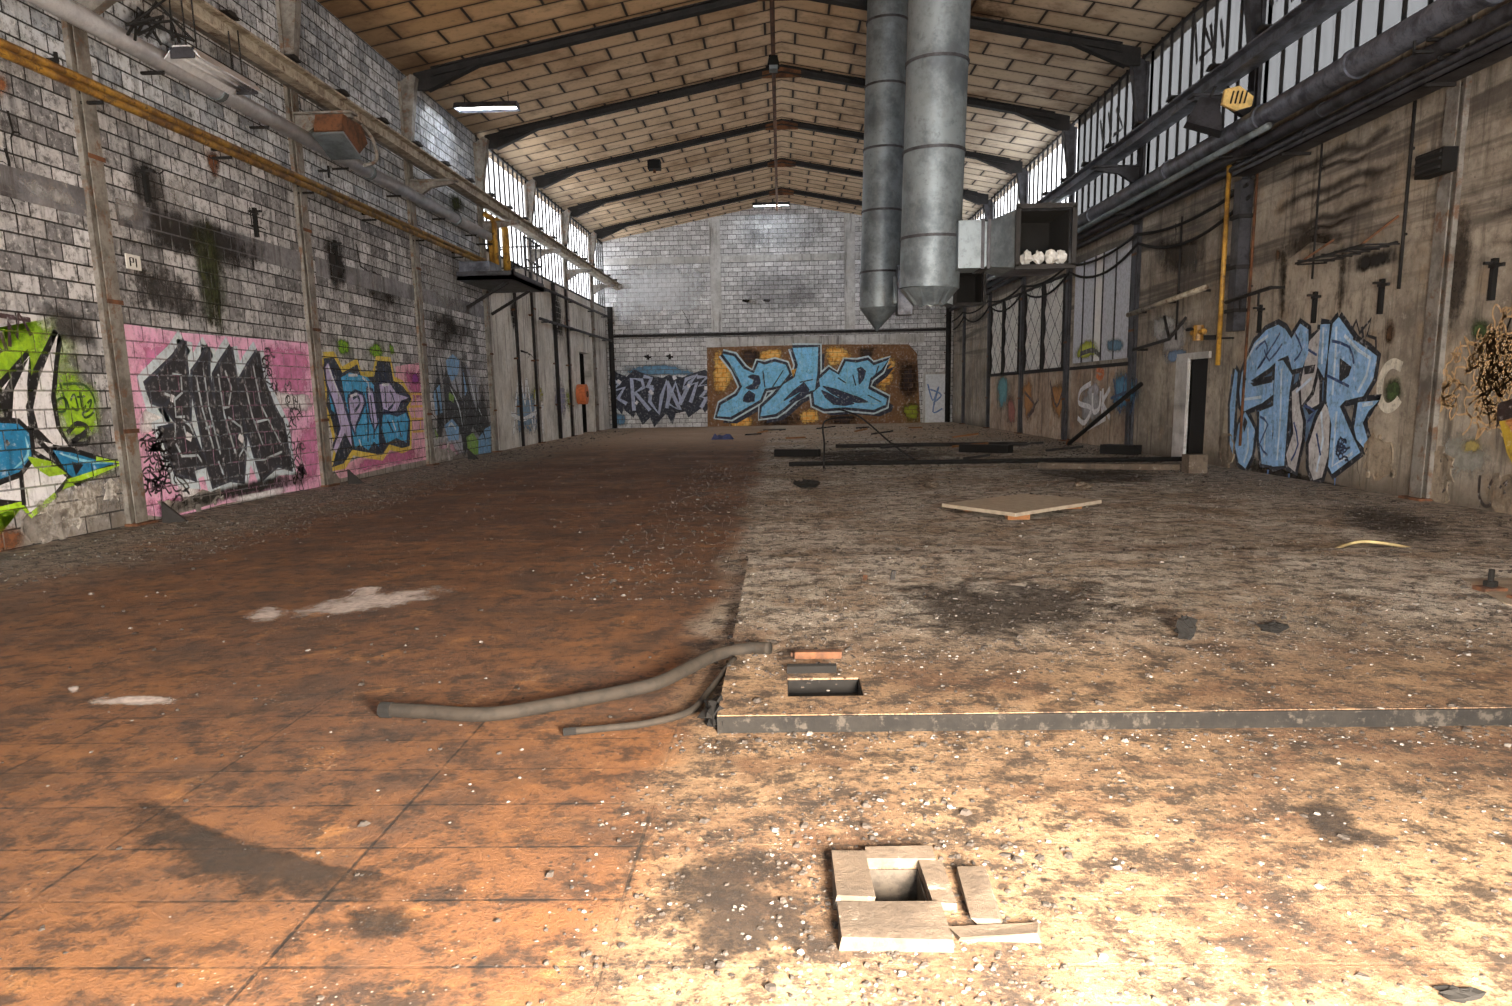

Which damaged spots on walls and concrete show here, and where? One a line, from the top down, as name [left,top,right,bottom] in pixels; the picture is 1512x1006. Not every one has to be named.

leakage [123,261,201,321]